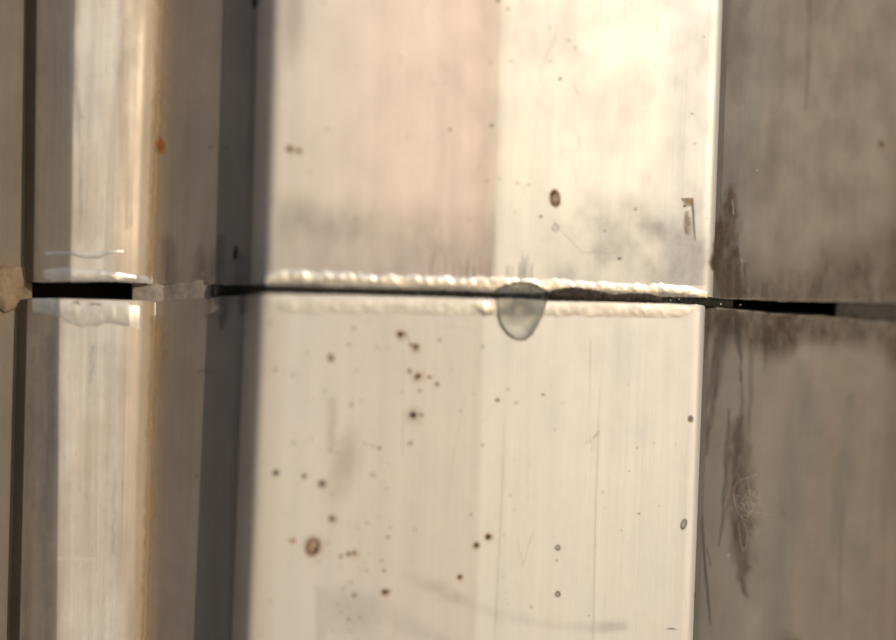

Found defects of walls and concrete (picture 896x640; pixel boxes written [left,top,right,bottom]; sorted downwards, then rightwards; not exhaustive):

corrosion [551,190,560,207]
leakage [712,190,746,298]
corrosion [306,538,320,556]
leakage [725,421,751,592]